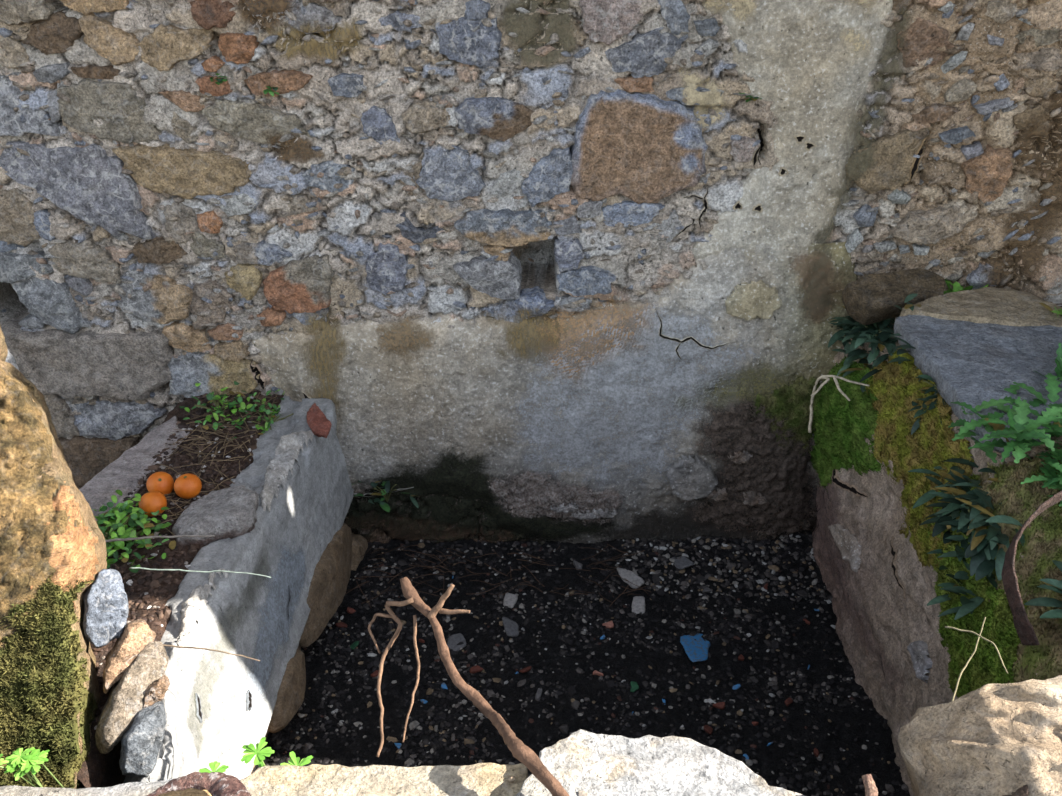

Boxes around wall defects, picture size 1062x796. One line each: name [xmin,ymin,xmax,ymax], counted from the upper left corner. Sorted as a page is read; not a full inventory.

crack [655,309,735,359]